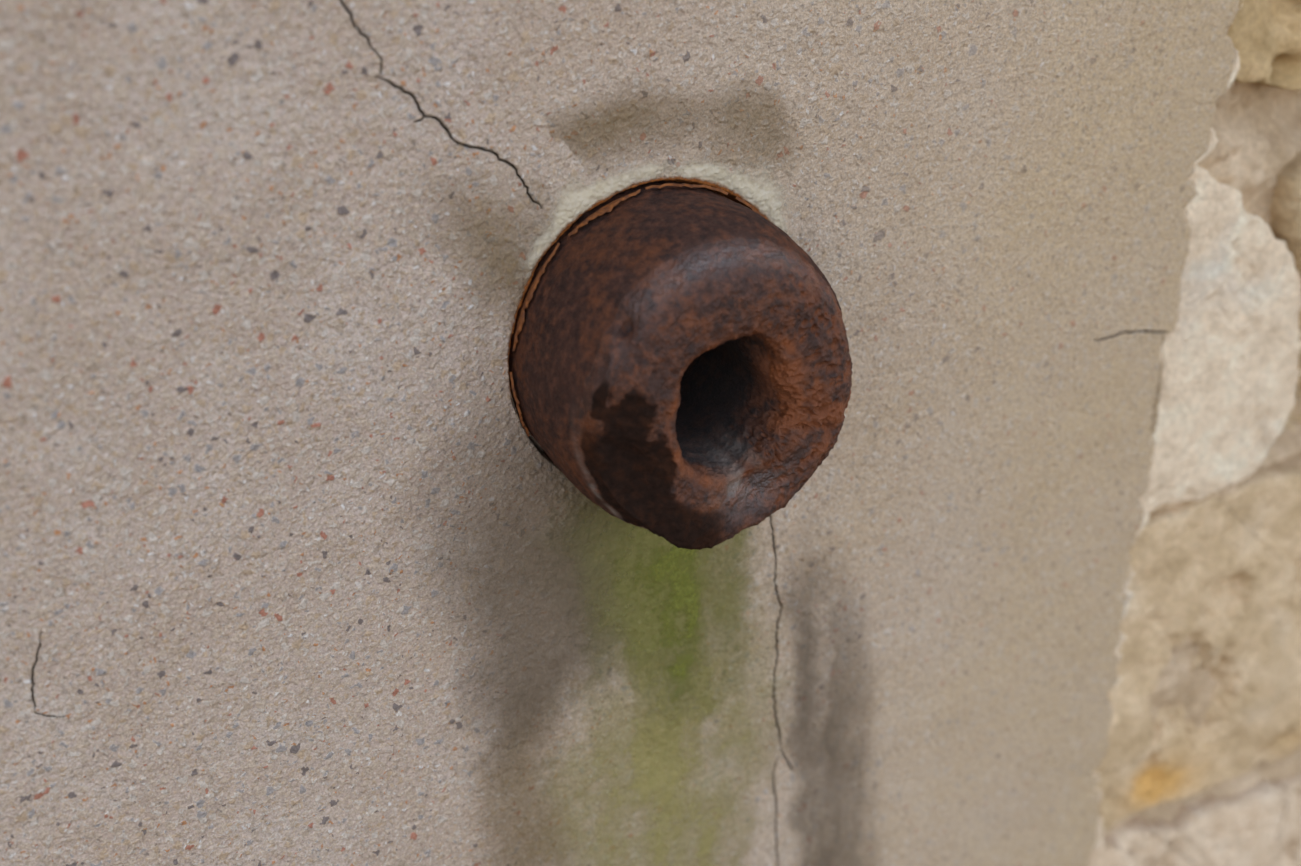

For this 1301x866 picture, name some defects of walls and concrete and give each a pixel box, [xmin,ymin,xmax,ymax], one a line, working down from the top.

crack [340,0,542,208]
rust [507,176,772,437]
water stain [470,497,751,866]